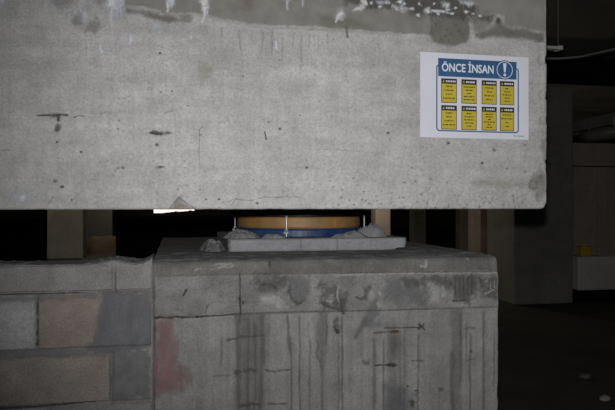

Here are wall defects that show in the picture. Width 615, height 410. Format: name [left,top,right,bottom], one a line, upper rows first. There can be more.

damp [107,0,545,66]